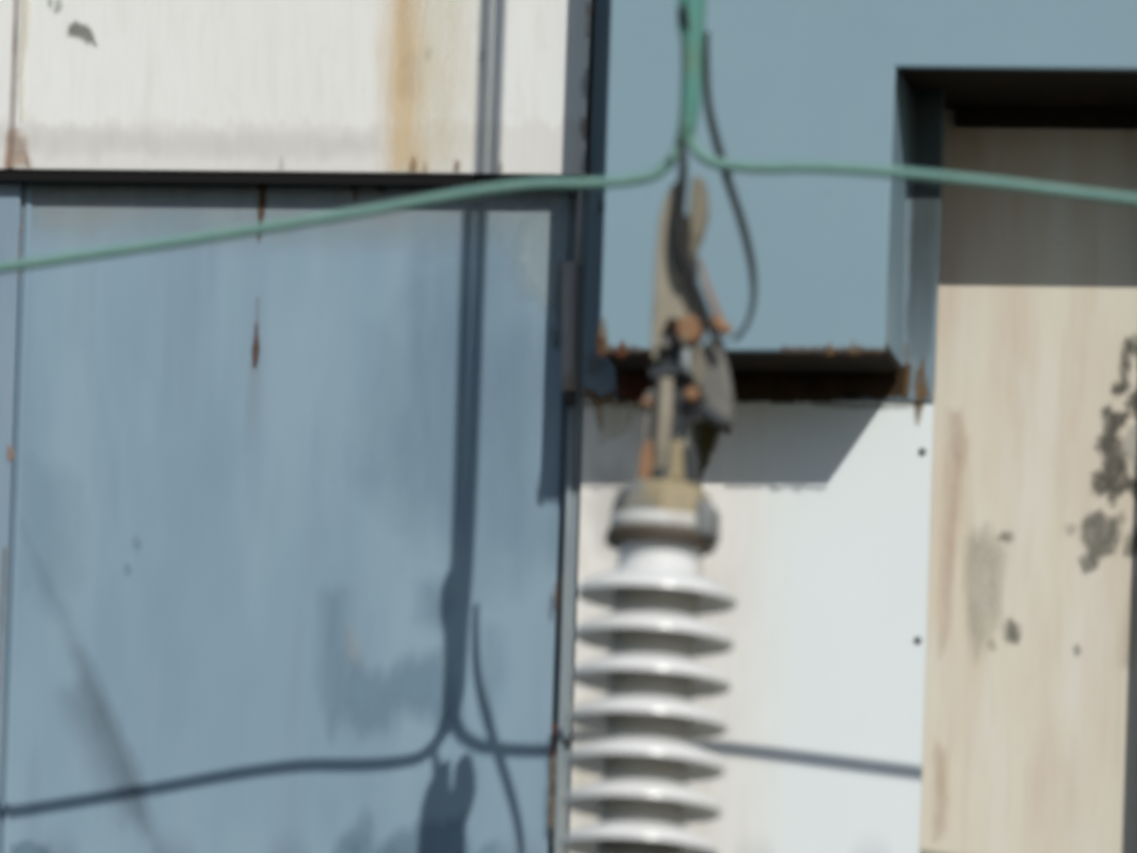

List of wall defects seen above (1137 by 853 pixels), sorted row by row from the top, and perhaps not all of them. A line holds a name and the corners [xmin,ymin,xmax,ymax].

peeling [69,22,96,45]
rust [598,327,652,355]
rust [583,371,654,433]
rust [729,365,928,420]